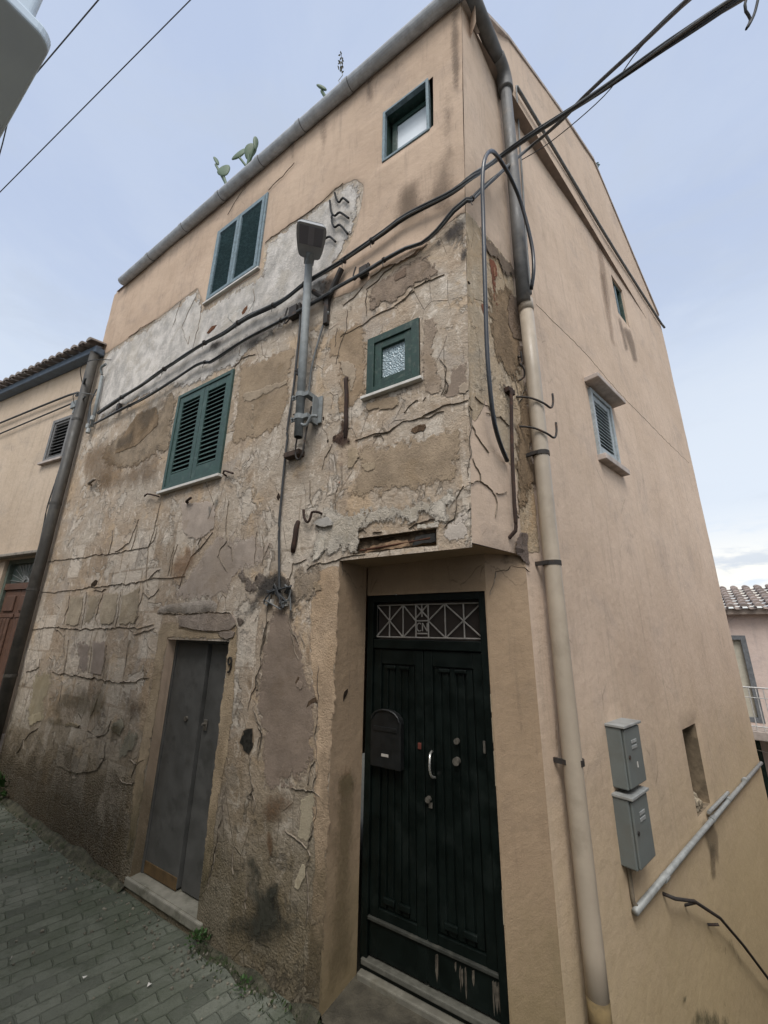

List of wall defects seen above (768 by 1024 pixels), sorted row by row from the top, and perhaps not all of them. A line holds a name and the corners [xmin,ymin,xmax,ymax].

peeling [98,184,359,469]
peeling [309,318,469,562]
crack [309,358,527,529]
crack [16,501,380,927]
peeling [158,501,317,790]
leakage [232,859,297,940]
peeling [294,864,306,890]
peeling [298,793,314,841]